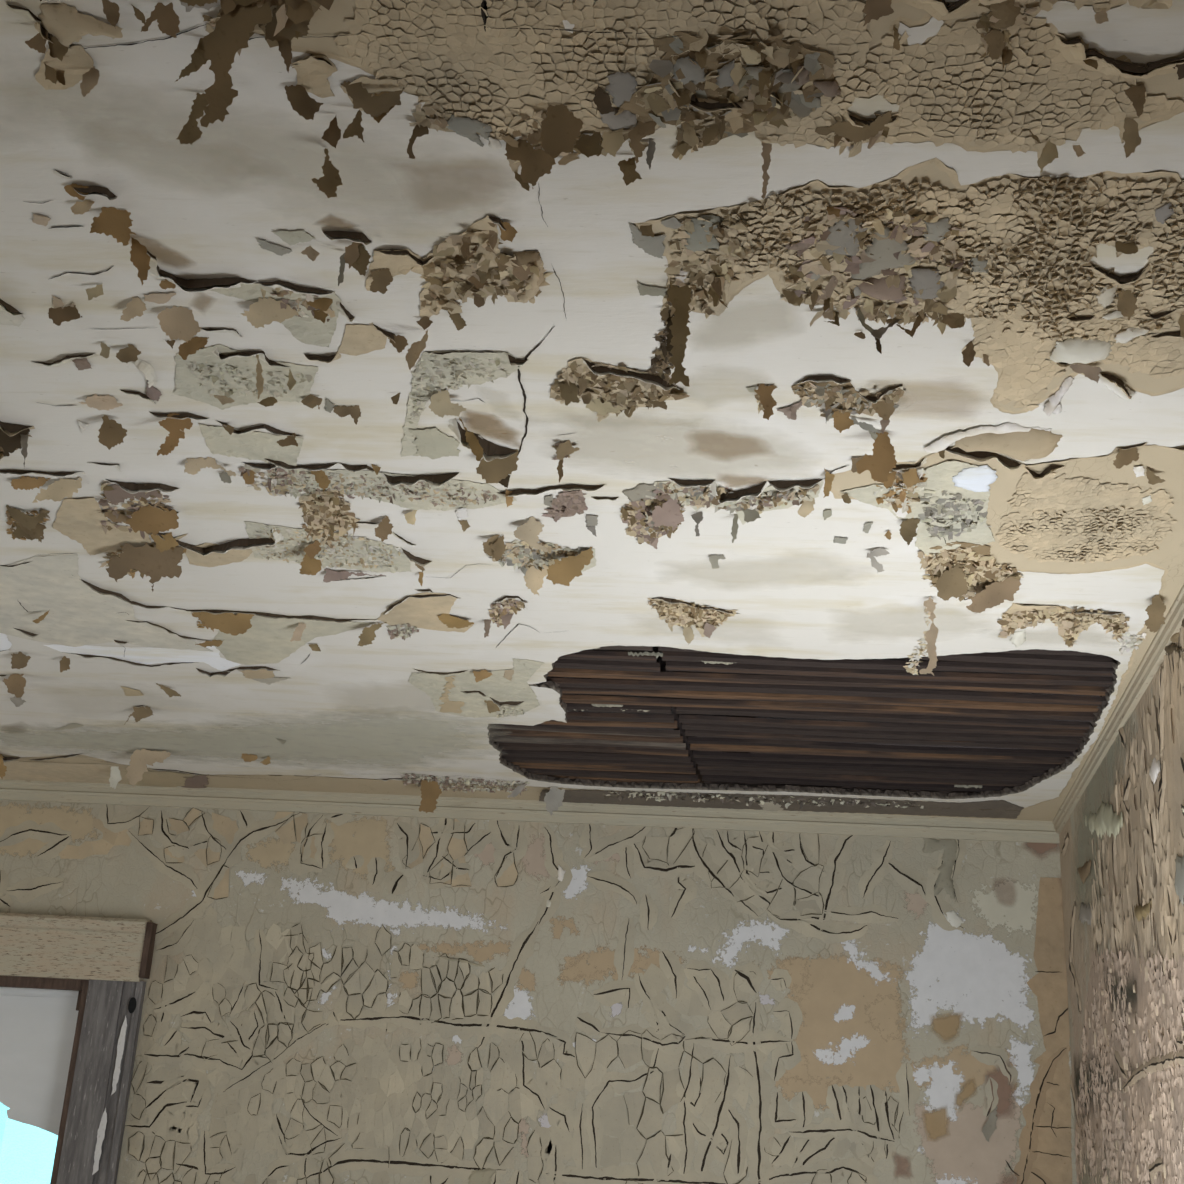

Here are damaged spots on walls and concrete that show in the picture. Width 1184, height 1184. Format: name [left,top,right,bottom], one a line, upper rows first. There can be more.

crack [84,23,209,49]
crack [323,0,1184,411]
crack [516,263,566,457]
flaking render [0,0,1184,819]
crack [0,753,111,779]
peeling [236,870,511,1007]
crack [0,772,927,1184]
crack [1006,626,1184,1184]
peeling [1083,801,1123,840]
peeling [1174,854,1184,905]